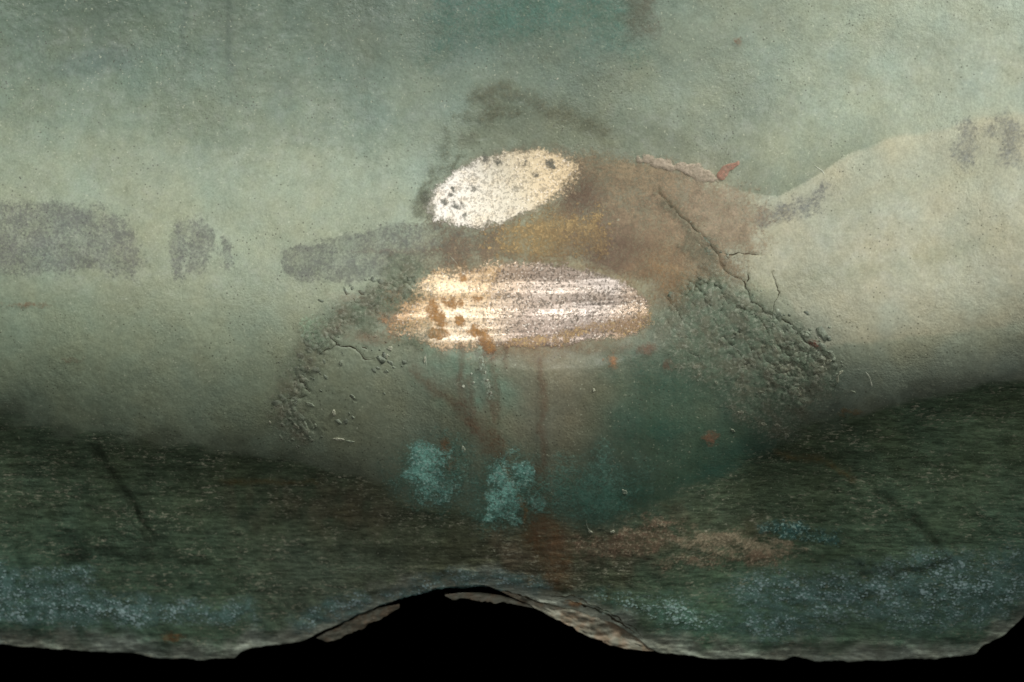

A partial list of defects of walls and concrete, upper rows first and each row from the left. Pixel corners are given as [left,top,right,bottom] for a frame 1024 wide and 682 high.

spalling [421,186,467,220]
crack [658,190,826,385]